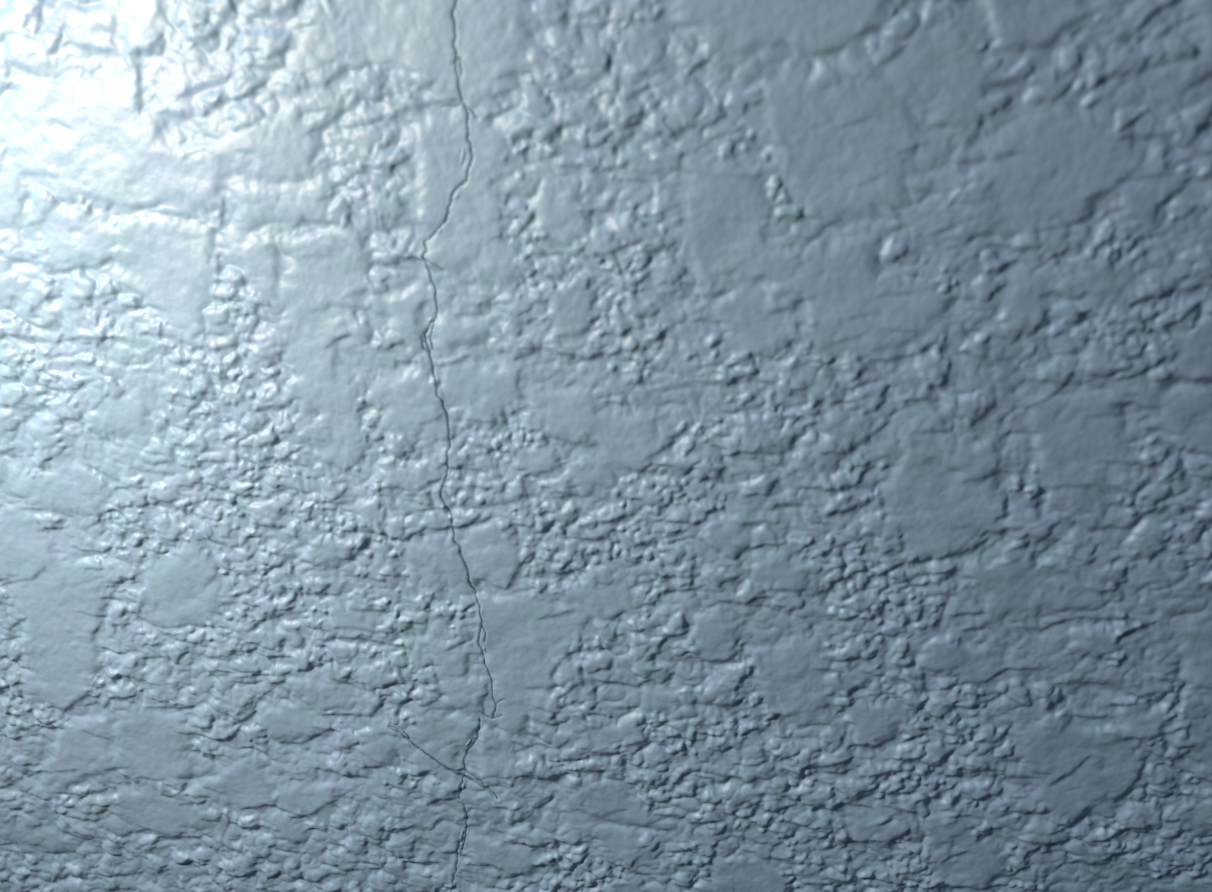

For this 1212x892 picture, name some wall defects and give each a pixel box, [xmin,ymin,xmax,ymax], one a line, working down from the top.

crack [390,0,502,892]